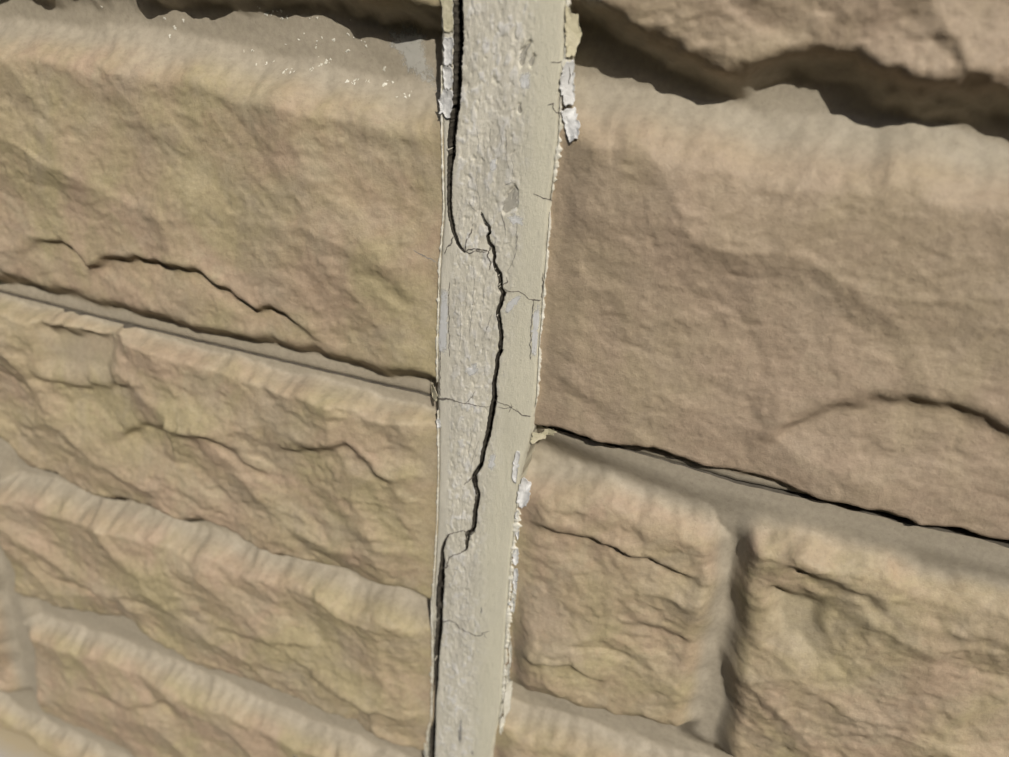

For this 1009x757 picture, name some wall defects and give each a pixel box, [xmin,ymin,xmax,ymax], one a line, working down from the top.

peeling [435,0,454,383]
spalling [503,188,518,212]
spalling [519,43,534,66]
peeling [551,0,582,199]
crack [414,0,544,757]
peeling [531,211,551,407]
peeling [499,450,531,735]